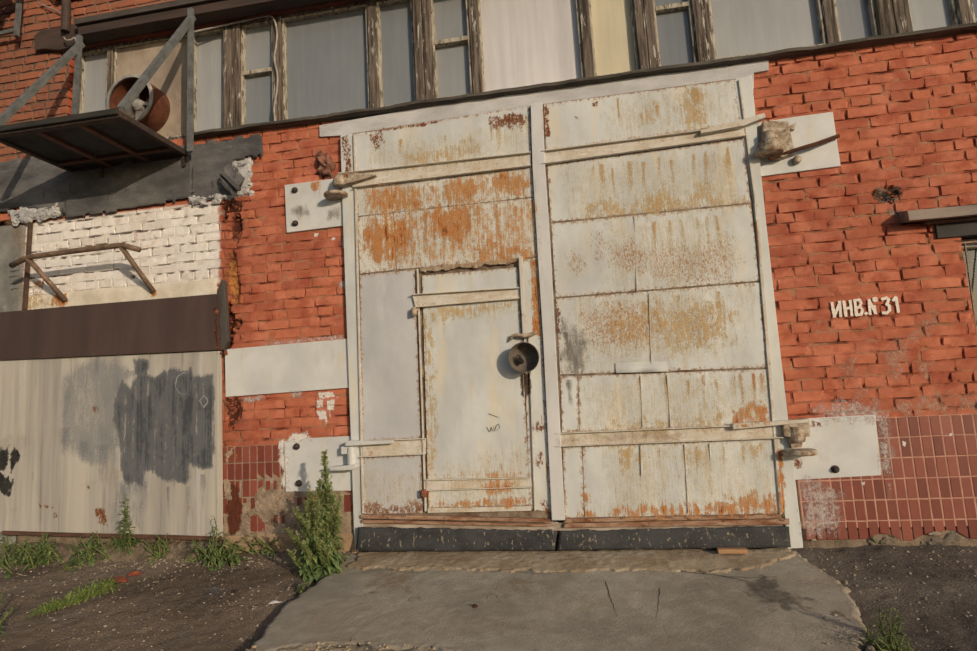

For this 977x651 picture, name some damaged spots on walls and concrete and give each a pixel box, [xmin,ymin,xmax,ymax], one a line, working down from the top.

corrosion [488,112,528,136]
corrosion [359,138,541,336]
corrosion [579,154,747,355]
corrosion [420,300,520,470]
corrosion [95,508,108,526]
spalling [223,479,232,500]
spalling [244,489,308,532]
corrosion [362,496,424,517]
corrosion [436,465,526,509]
corrosion [612,449,802,521]